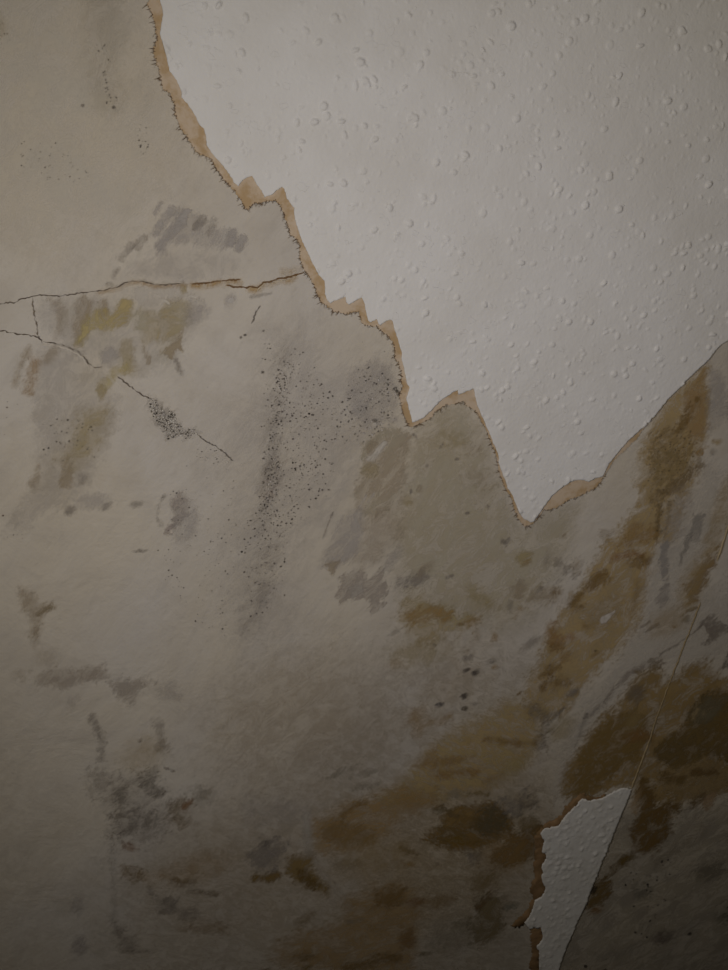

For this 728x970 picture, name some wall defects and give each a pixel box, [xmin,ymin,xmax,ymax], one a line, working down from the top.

crack [0,273,303,399]
spalling [148,399,197,440]
damp [249,367,728,970]